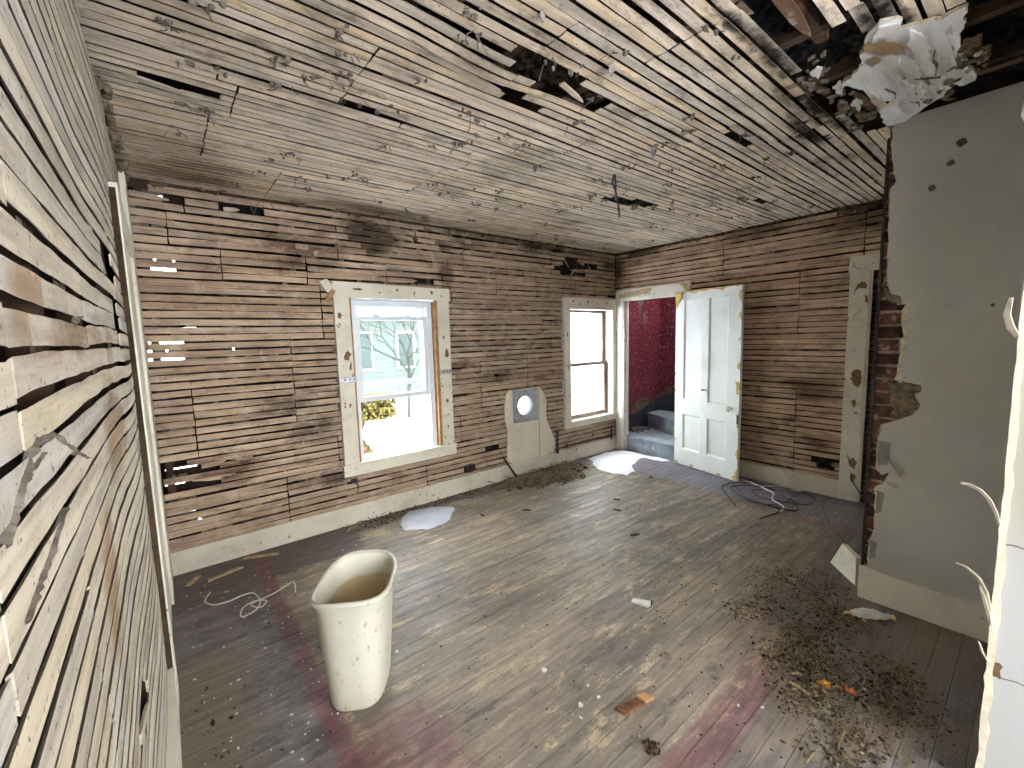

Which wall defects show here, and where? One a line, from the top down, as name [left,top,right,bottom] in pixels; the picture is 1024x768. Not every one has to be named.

spalling [916,0,928,19]
spalling [942,0,993,13]
spalling [410,29,510,68]
spalling [494,47,614,105]
spalling [920,5,1024,104]
spalling [816,129,922,567]